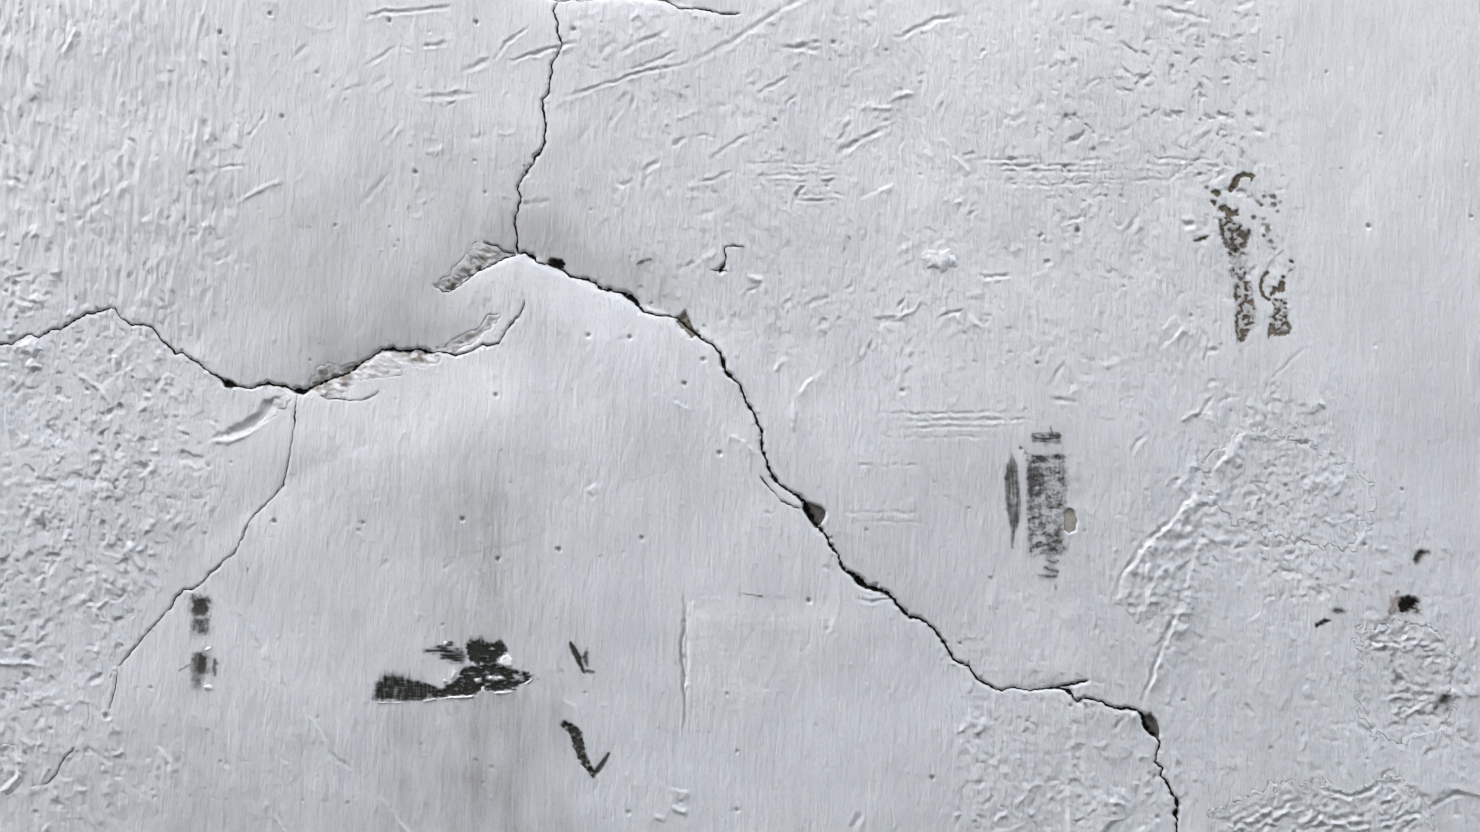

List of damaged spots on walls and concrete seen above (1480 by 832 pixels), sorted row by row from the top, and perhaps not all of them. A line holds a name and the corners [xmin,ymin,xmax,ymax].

spalling [310,314,501,400]
spalling [213,395,292,439]
crack [439,0,1179,832]
crack [0,300,525,705]
peeling [1005,431,1077,578]
peeling [375,639,533,704]
spalling [562,721,610,778]